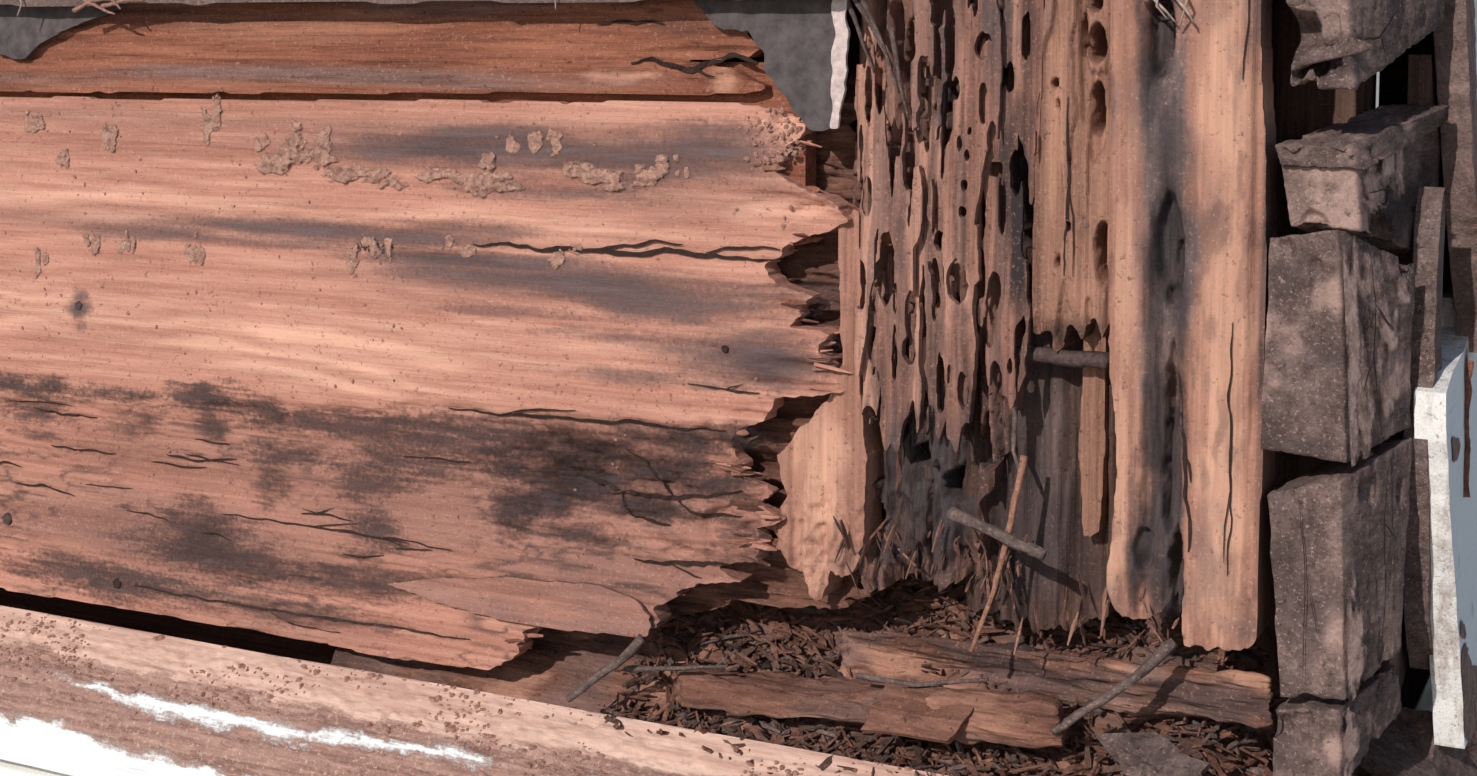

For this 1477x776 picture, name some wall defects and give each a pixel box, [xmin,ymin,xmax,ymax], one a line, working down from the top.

peeling [1467,0,1477,201]
leakage [139,219,740,323]
crack [473,239,781,262]
leakage [712,331,814,381]
peeling [1381,279,1410,350]
crack [0,400,167,520]
crack [151,439,239,468]
crack [201,507,450,558]
leakage [0,373,759,632]
peeling [387,575,652,637]
peeling [0,605,949,776]
peeling [1348,621,1477,776]